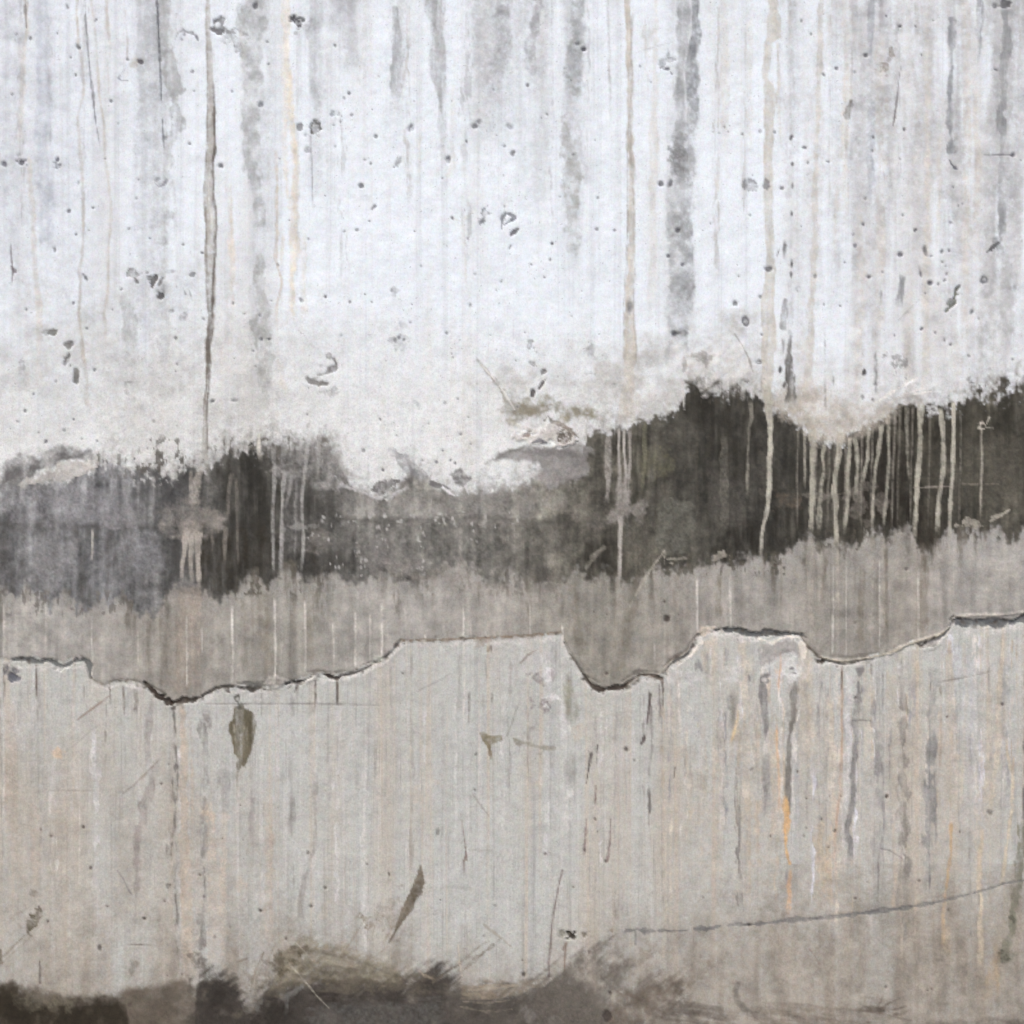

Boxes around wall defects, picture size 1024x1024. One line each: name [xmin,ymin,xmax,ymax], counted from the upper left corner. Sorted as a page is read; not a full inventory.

damp [421,0,450,203]
damp [636,0,762,396]
corrosion [109,684,141,718]
crack [1,639,408,712]
damp [229,713,254,758]
crack [434,634,488,644]
crack [553,623,891,746]
corrosion [681,636,845,917]
damp [822,644,918,909]
crack [937,671,991,684]
crack [917,612,1024,653]
damp [980,883,1024,1002]